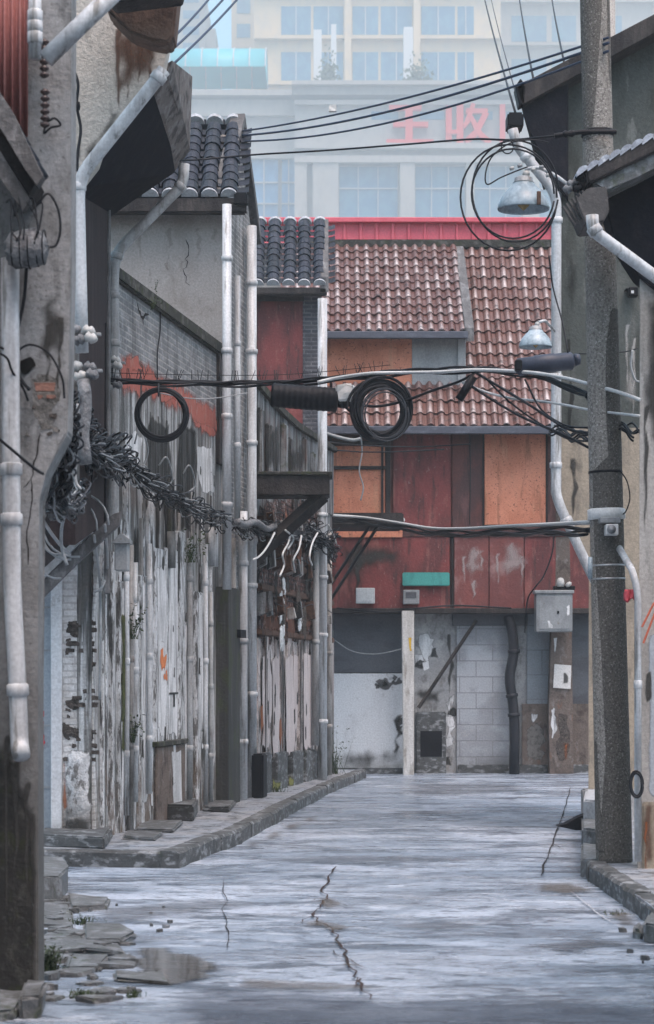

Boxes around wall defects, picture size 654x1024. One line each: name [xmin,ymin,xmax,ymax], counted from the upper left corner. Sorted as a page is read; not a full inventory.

water stain [116,29,154,104]
spalling [20,357,61,437]
peeling [121,355,217,493]
water stain [133,528,147,576]
spalling [259,499,302,542]
peeling [462,550,483,595]
peeling [496,544,524,572]
spalling [257,539,313,755]
peeling [414,633,438,671]
crack [541,786,571,875]
crack [221,879,237,950]
crack [294,866,372,999]